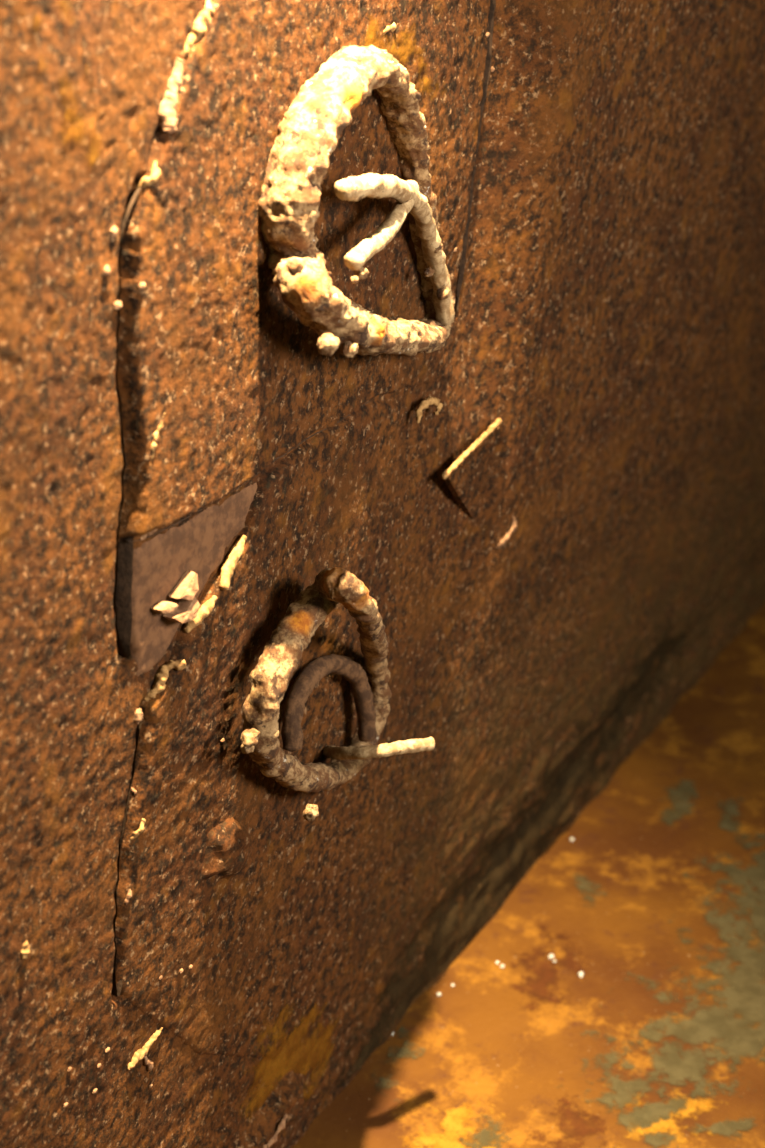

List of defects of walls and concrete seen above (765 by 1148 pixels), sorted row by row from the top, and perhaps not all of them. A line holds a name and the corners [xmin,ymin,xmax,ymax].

crack [158,0,214,134]
corrosion [365,16,438,98]
crack [103,161,206,659]
spalling [415,396,443,423]
peeling [441,418,507,520]
spalling [496,515,517,548]
spalling [130,483,258,676]
crack [111,535,247,997]
corrosion [514,936,578,1010]
corrosion [405,1104,496,1148]
corrosion [558,1099,606,1147]
corrosion [628,1093,712,1143]